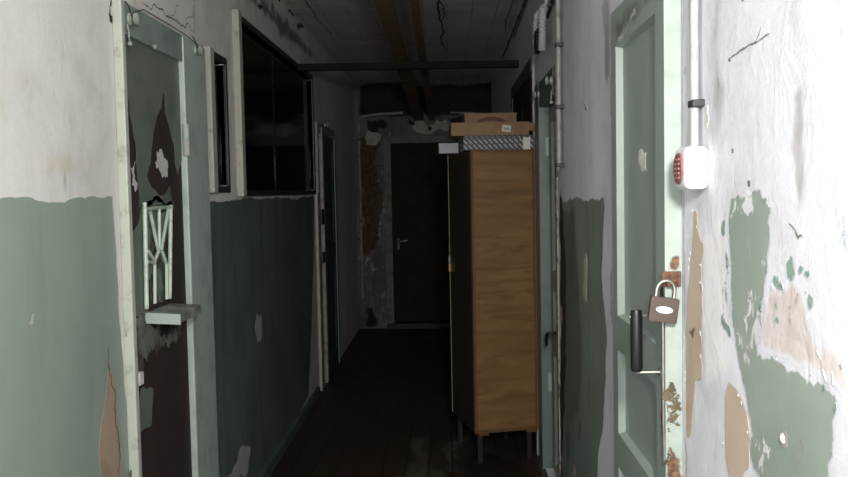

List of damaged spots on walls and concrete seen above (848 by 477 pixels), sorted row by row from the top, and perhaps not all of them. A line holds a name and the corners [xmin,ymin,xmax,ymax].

crack [134,1,195,32]
crack [436,0,446,50]
crack [729,28,770,59]
spalling [358,130,383,256]
peeling [662,210,704,470]
peeling [721,180,848,477]
peeling [98,347,123,477]
corrosion [668,448,681,477]